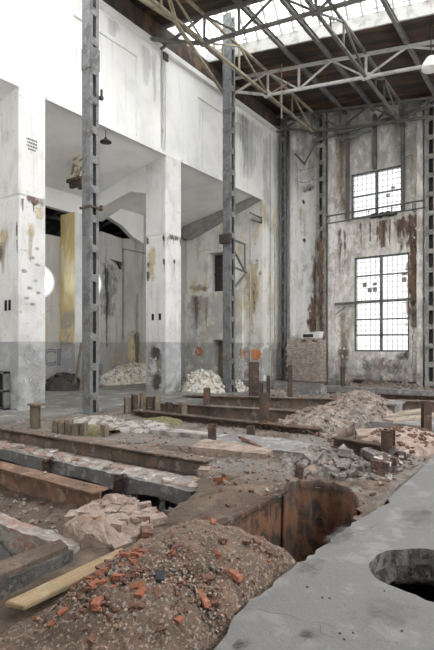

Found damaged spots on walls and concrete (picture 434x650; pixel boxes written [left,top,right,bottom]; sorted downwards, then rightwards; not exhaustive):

rust [307,237,324,340]
rust [359,214,425,328]
water stain [128,333,141,364]
flaking render [148,345,162,389]